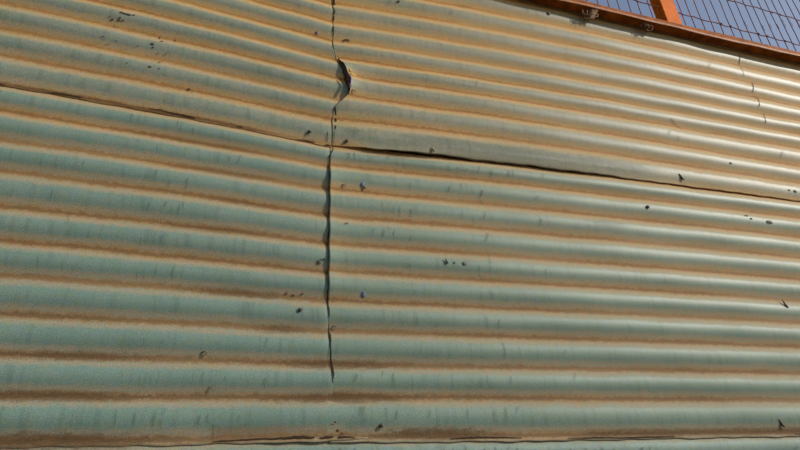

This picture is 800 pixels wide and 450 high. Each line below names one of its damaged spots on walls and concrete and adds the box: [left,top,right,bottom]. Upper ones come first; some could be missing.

crack [333,0,350,91]
crack [148,108,195,118]
crack [297,106,337,162]
crack [383,150,608,176]
crack [327,265,335,379]
crack [212,434,354,442]
crack [451,433,521,441]
crack [568,433,675,441]